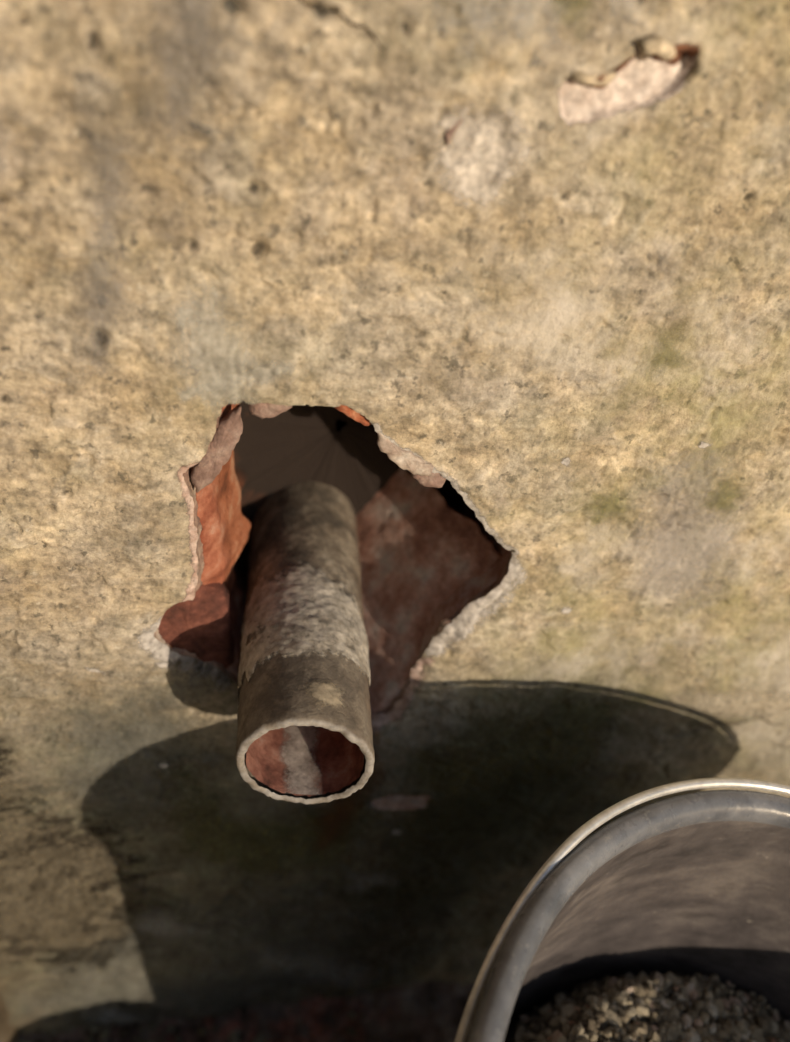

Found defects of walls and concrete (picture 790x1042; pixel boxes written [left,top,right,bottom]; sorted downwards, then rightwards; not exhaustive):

crack [299,0,384,51]
spalling [558,34,700,125]
spalling [138,401,526,733]
corrosion [324,773,373,843]
water stain [0,697,438,1022]